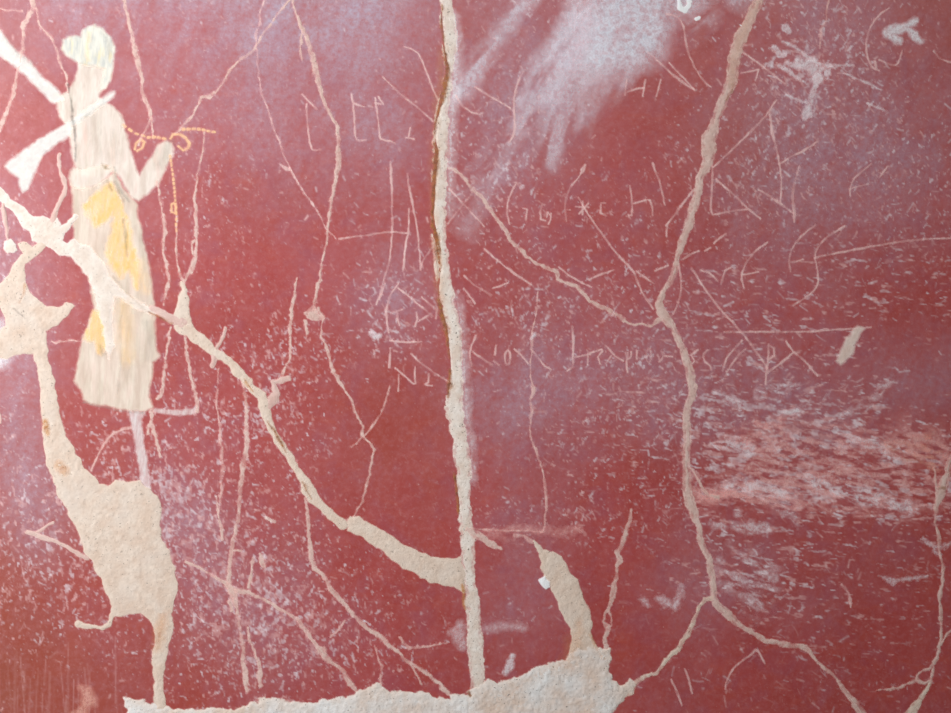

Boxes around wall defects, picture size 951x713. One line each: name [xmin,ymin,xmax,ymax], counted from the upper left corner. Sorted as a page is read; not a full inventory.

crack [0,0,69,132]
crack [123,0,376,487]
crack [147,327,450,695]
flaking render [0,153,635,713]
leakage [587,0,663,68]
crack [431,0,864,713]
crack [880,460,951,713]